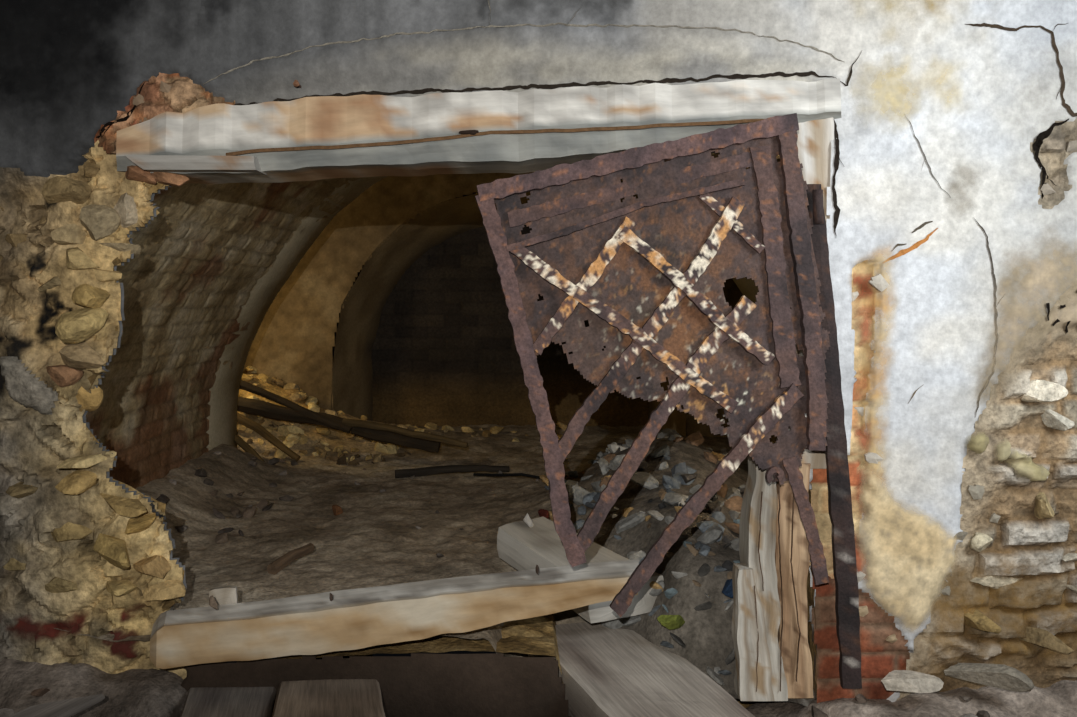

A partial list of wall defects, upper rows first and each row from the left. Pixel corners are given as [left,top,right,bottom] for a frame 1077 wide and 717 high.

crack [203,0,862,105]
crack [832,120,844,235]
crack [967,23,1077,199]
spalling [1030,117,1077,209]
spalling [0,72,235,680]
rust [855,254,891,480]
spalling [809,221,1077,703]